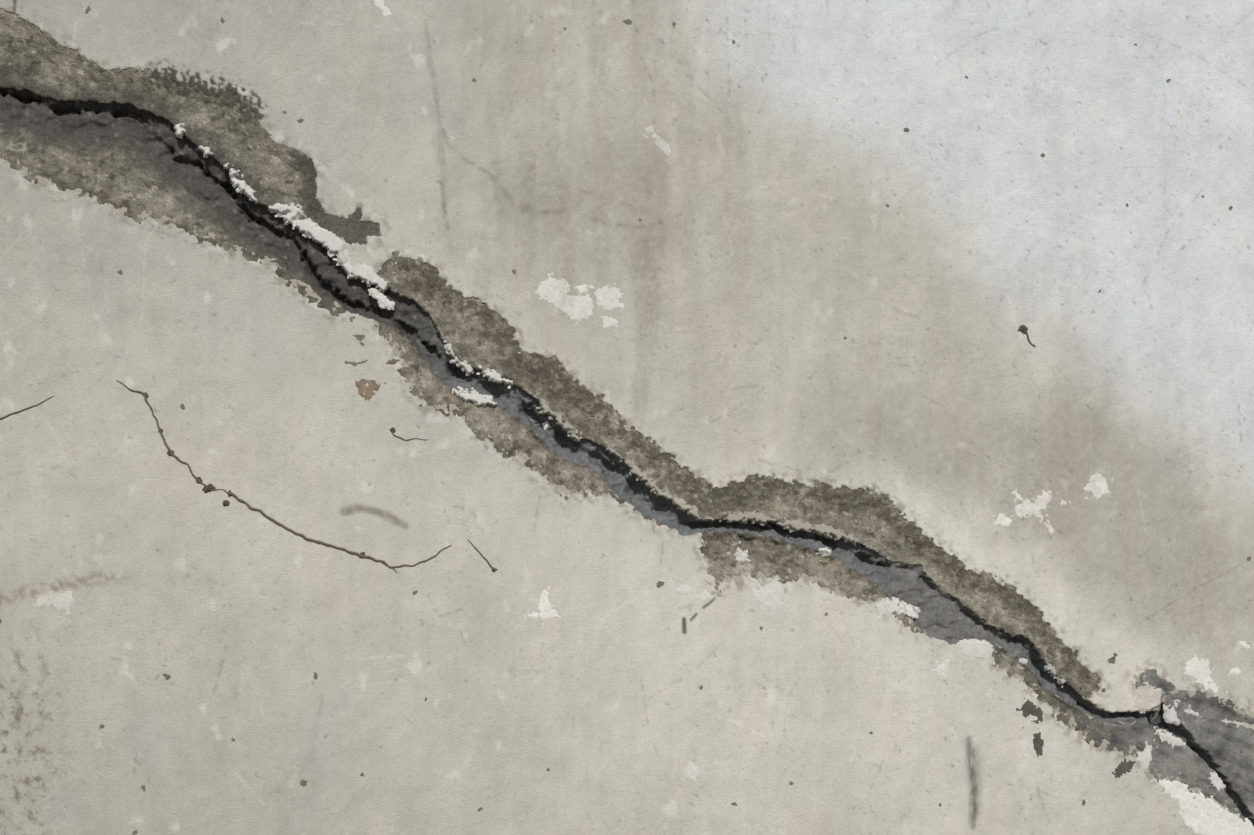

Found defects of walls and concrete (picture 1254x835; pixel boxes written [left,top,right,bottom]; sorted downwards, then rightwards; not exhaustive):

spalling [0,9,381,253]
crack [229,165,258,204]
crack [268,202,390,292]
crack [368,288,395,310]
spalling [0,120,676,530]
crack [481,368,513,384]
crack [452,386,497,407]
crack [625,459,701,520]
crack [721,510,859,545]
spalling [377,251,1254,835]
peeling [32,590,81,616]
crack [1149,709,1163,724]